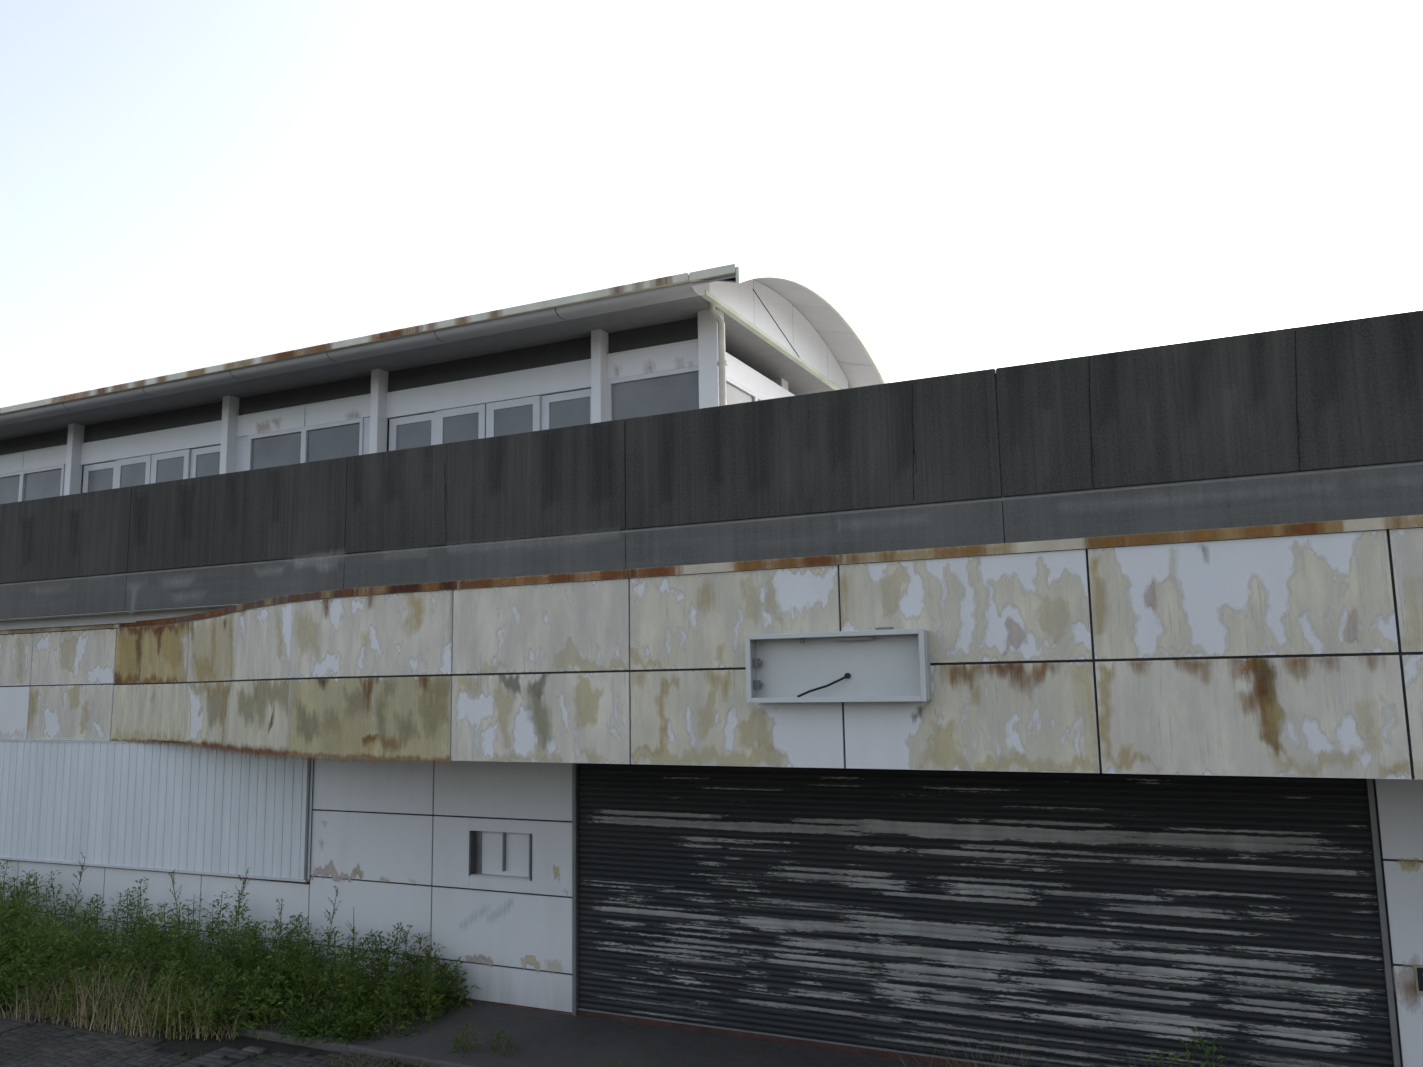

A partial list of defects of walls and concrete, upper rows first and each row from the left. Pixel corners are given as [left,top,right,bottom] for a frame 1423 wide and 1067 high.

rust [269,343,329,360]
rust [59,376,164,401]
rust [119,566,679,658]
rust [116,676,171,684]
rust [1234,658,1284,750]
rust [111,736,449,763]
peeling [583,786,1388,1067]